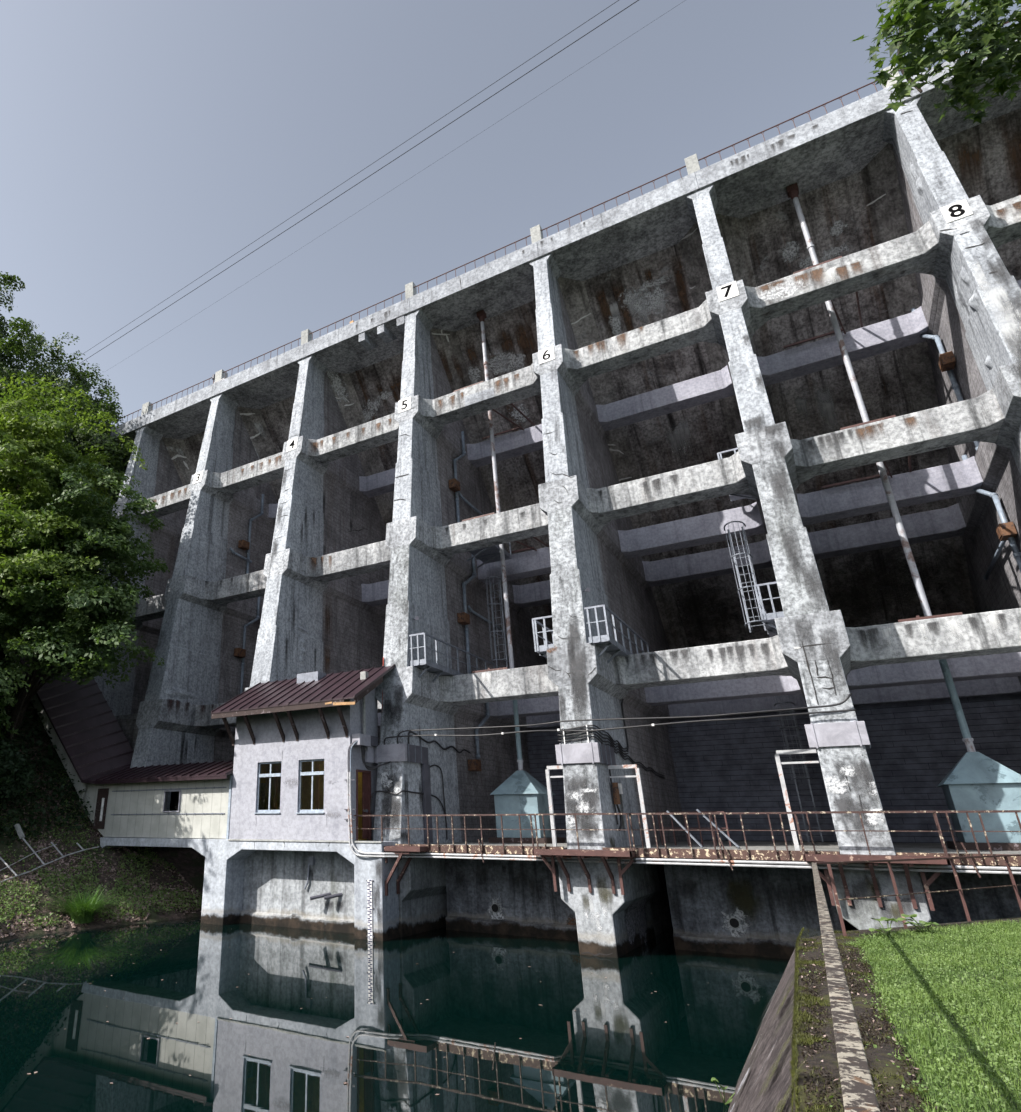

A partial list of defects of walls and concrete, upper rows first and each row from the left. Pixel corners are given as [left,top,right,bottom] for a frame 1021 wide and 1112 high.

leakage [609,276,669,342]
rust [760,262,861,293]
leakage [973,262,1021,376]
rust [438,325,536,388]
rust [855,424,881,437]